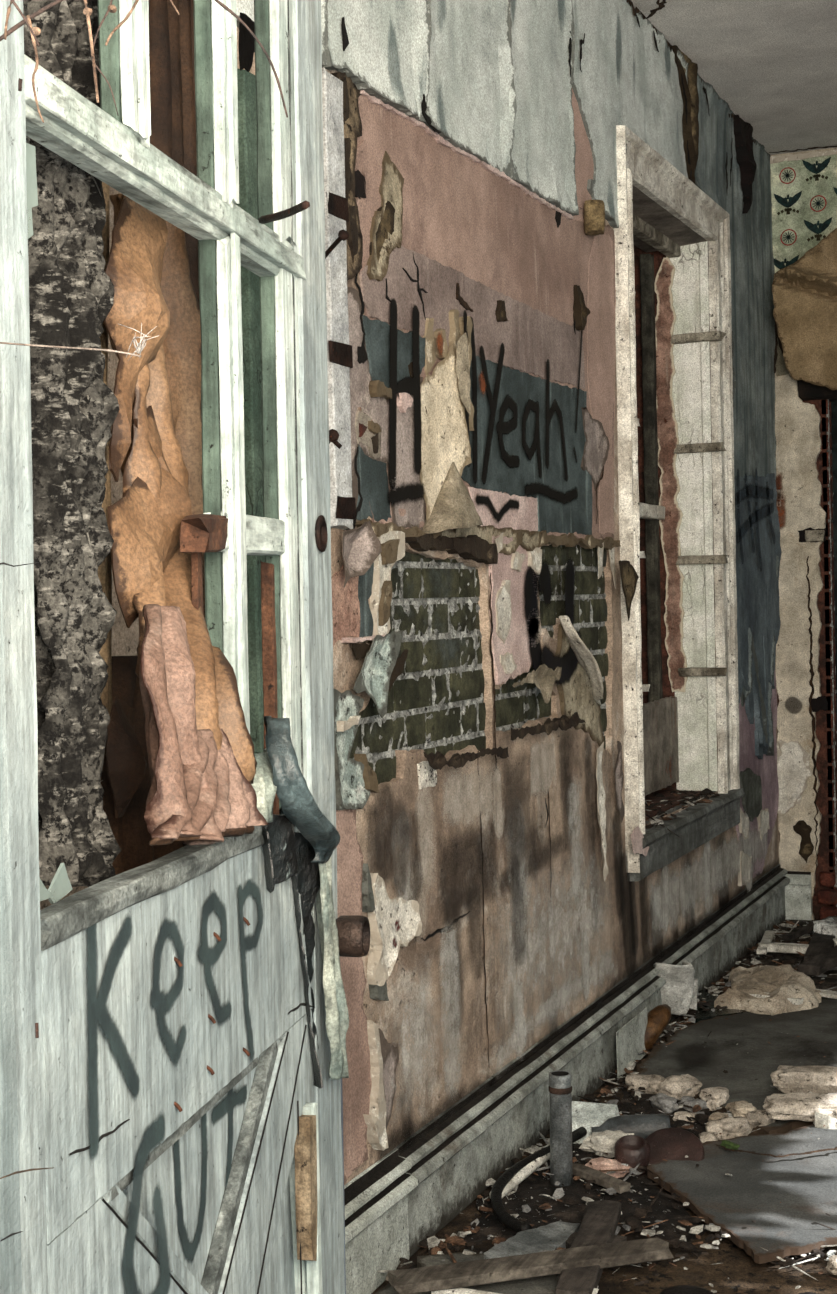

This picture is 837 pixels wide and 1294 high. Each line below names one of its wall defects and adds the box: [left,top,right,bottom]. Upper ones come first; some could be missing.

flaking render [331,72,404,282]
flaking render [357,346,368,364]
flaking render [355,380,414,460]
peeling [408,283,486,431]
flaking render [798,527,827,542]
flaking render [331,531,609,810]
peeling [734,473,814,886]
flaking render [811,696,828,712]
peeling [361,863,422,1001]
damp [370,740,780,1161]
peeling [363,1020,399,1151]